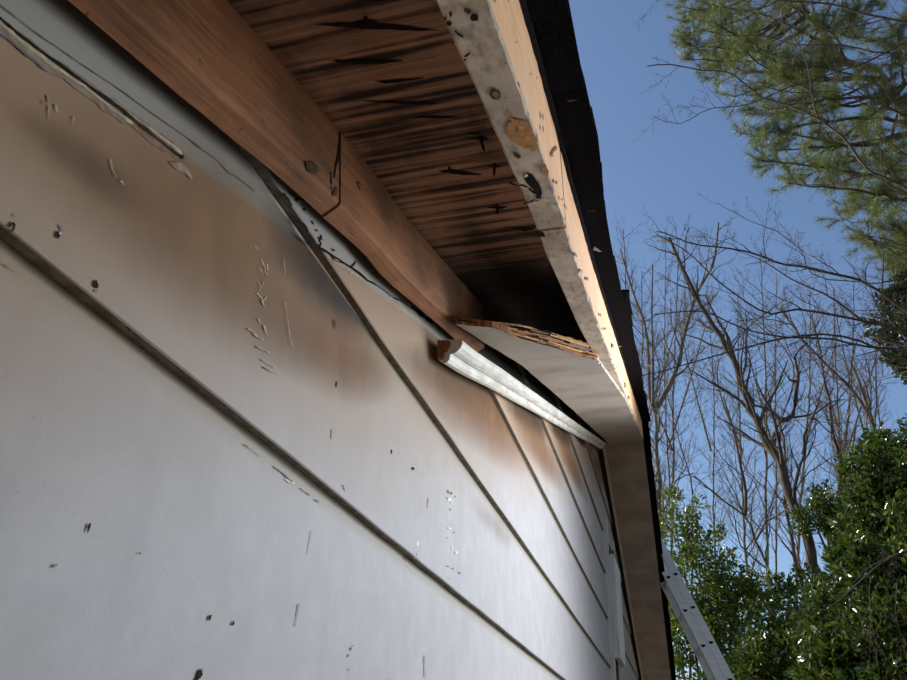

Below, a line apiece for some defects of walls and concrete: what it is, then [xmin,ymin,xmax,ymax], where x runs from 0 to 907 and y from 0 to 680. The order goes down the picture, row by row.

crack [329,133,343,199]